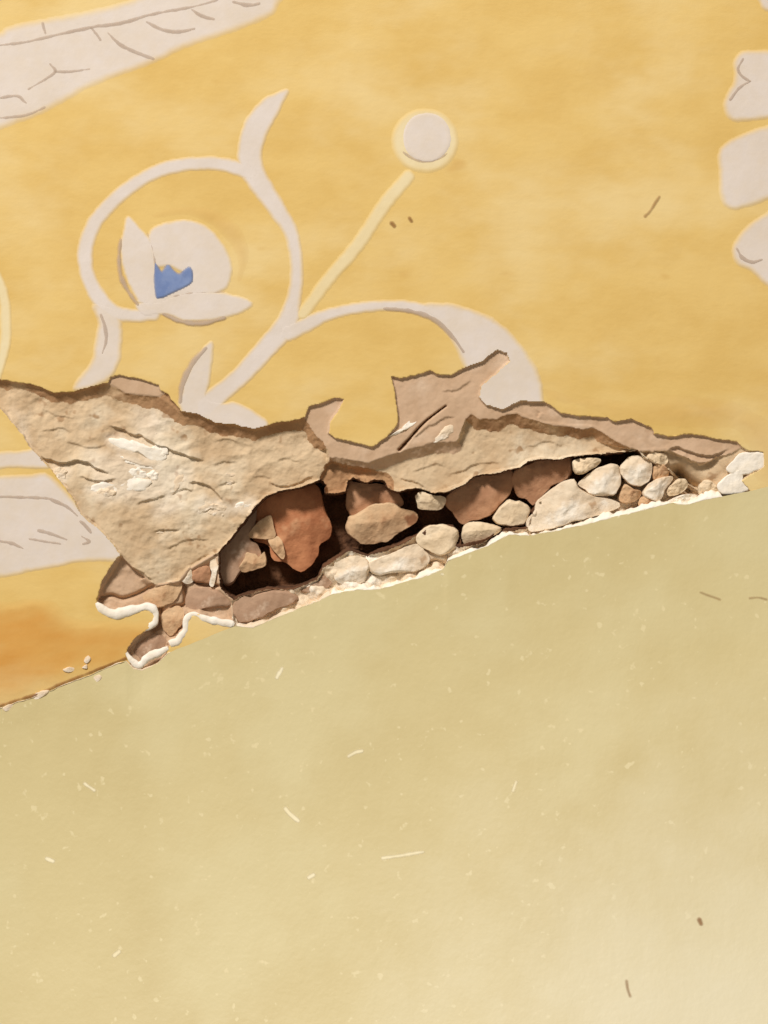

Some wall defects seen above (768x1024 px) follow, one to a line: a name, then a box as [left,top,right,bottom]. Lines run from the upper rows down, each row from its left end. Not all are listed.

spalling [0,350,764,671]